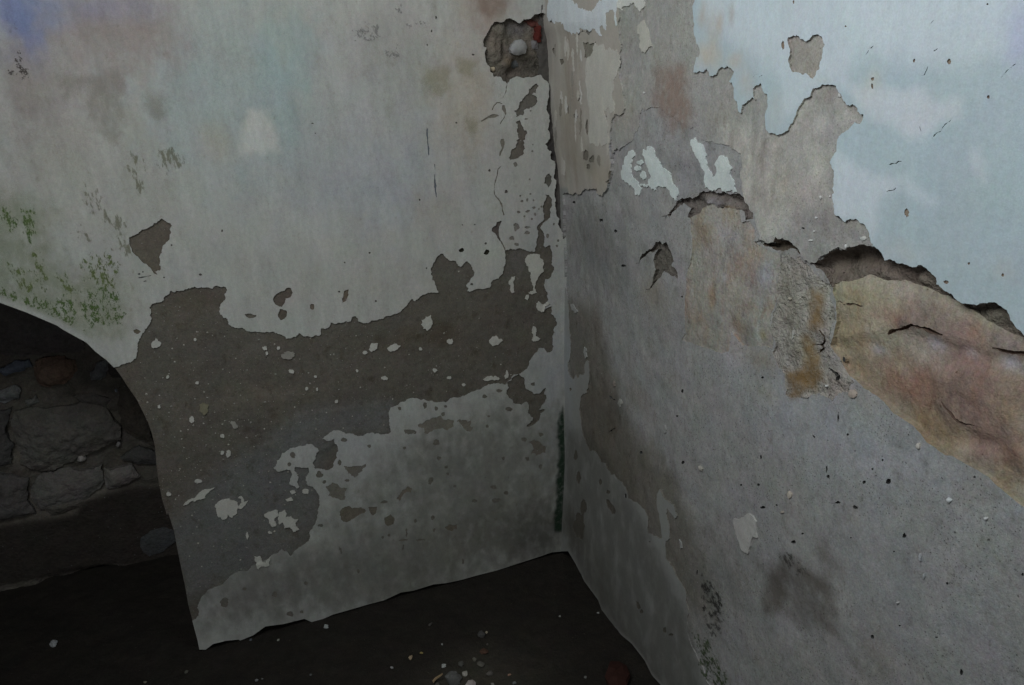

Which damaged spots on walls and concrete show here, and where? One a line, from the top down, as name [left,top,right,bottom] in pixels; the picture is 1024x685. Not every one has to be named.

leakage [0,207,73,294]
leakage [81,255,119,289]
flaking render [115,193,557,621]
flaking render [483,0,1024,685]